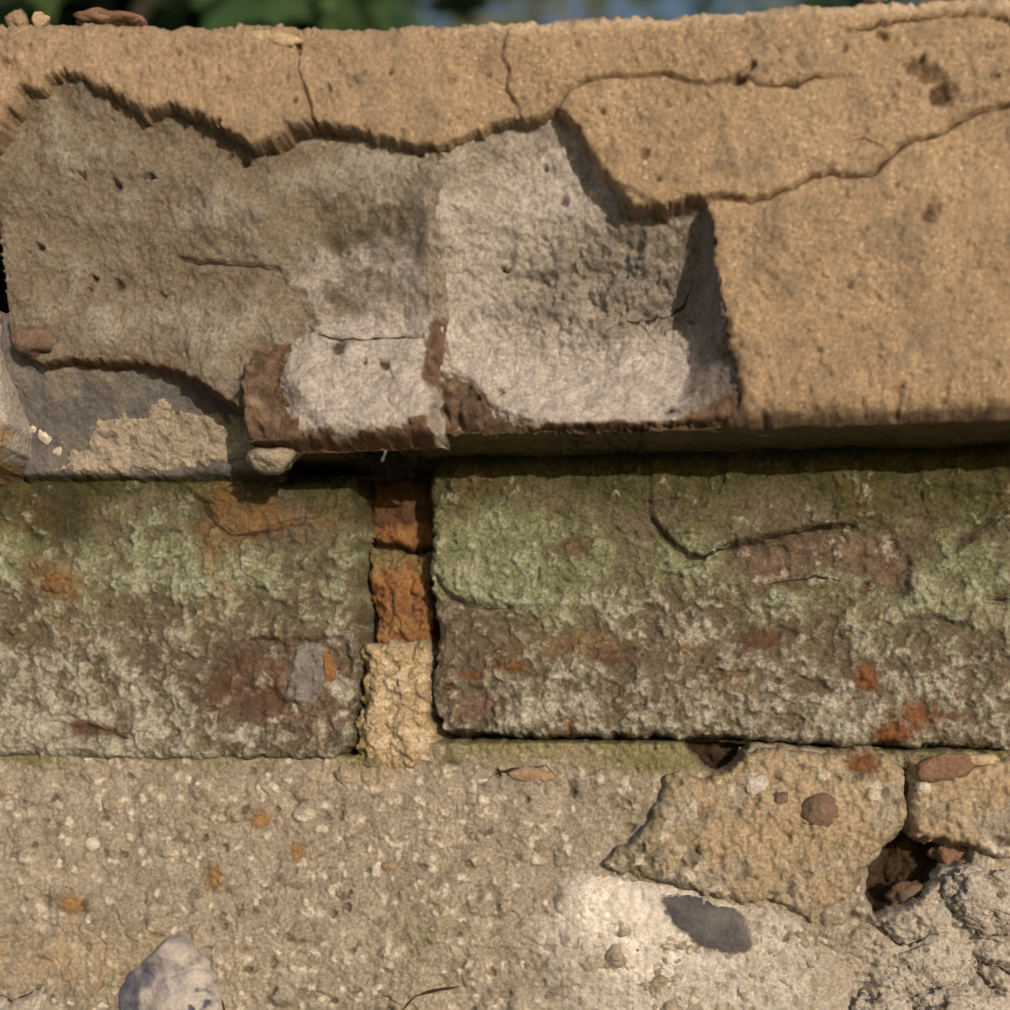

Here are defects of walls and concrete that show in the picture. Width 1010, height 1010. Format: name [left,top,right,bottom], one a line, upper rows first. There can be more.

spalling [252,29,303,47]
crack [848,15,1007,33]
crack [560,72,843,106]
crack [707,102,1010,205]
crack [183,260,279,271]
spalling [0,77,741,454]
crack [651,519,848,586]
crack [0,988,40,1003]